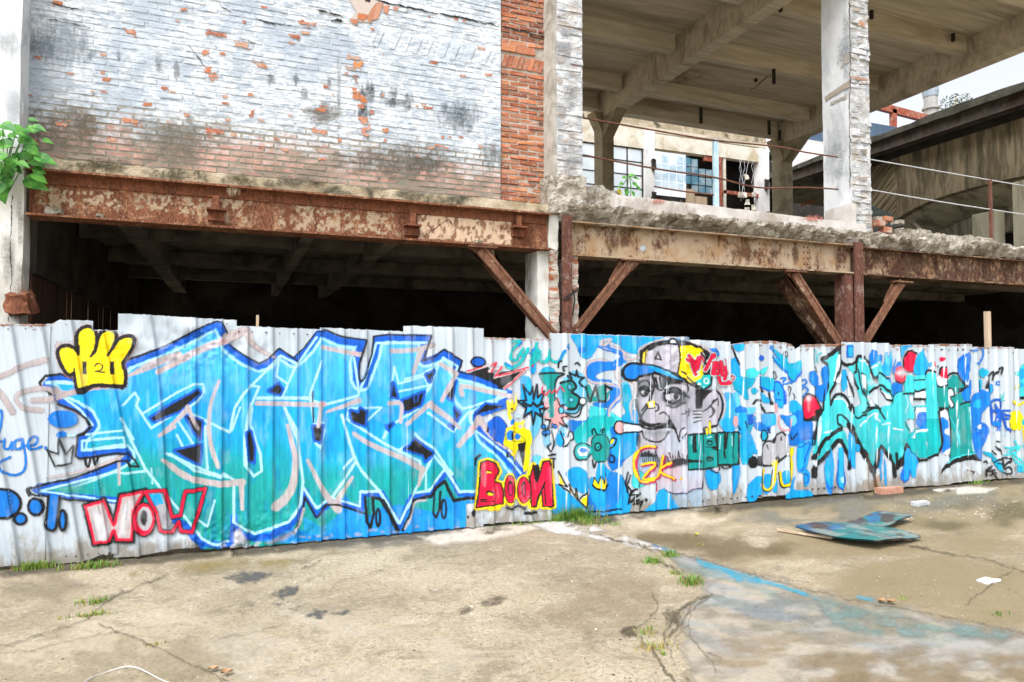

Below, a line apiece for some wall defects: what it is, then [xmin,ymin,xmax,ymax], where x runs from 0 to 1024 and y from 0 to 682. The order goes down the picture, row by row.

spalling [350,0,399,30]
peeling [205,29,249,49]
peeling [288,19,317,44]
peeling [202,50,225,81]
spalling [825,52,868,105]
spalling [345,54,389,142]
flaking render [478,0,577,204]
damp [30,108,96,151]
peeling [206,119,237,137]
damp [352,145,444,176]
rust [584,225,635,253]
spalling [558,202,1024,260]